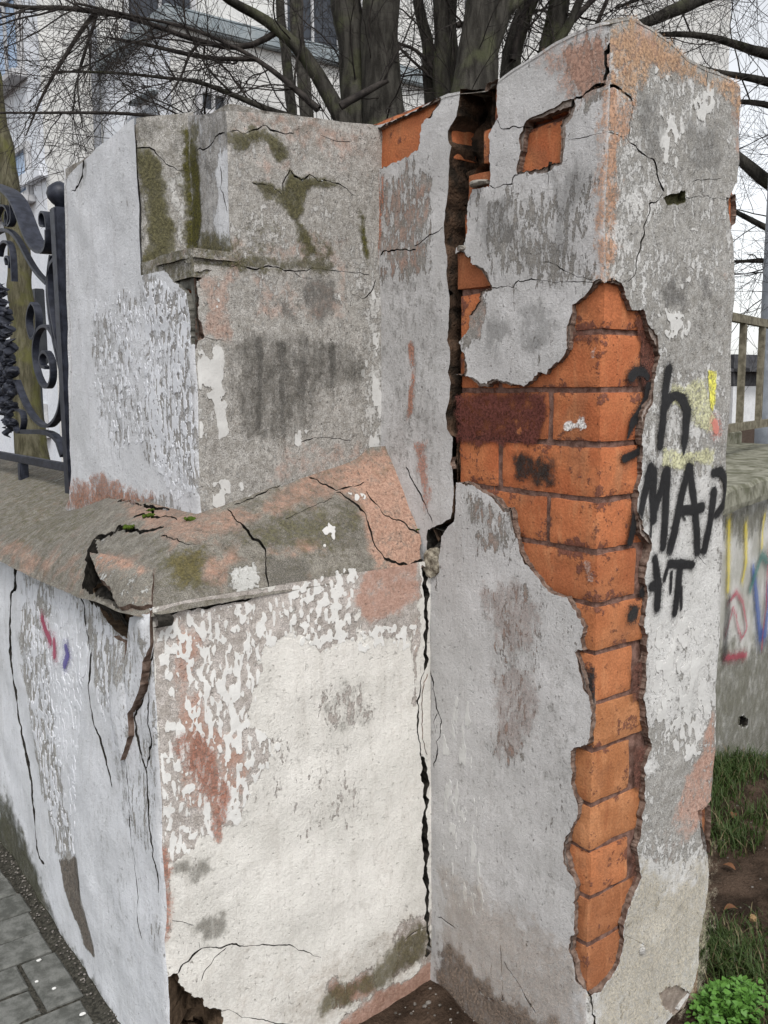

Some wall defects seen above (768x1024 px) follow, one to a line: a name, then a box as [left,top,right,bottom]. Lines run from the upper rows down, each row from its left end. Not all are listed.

peeling [94,260,250,508]
damp [182,129,333,274]
flaking render [456,247,503,339]
flaking render [516,99,576,175]
crack [571,42,723,282]
crack [9,569,44,865]
crack [80,486,279,938]
peeling [157,568,417,861]
crack [234,89,531,957]
flaking render [450,277,719,997]
crack [172,920,321,981]
damp [320,925,559,1024]